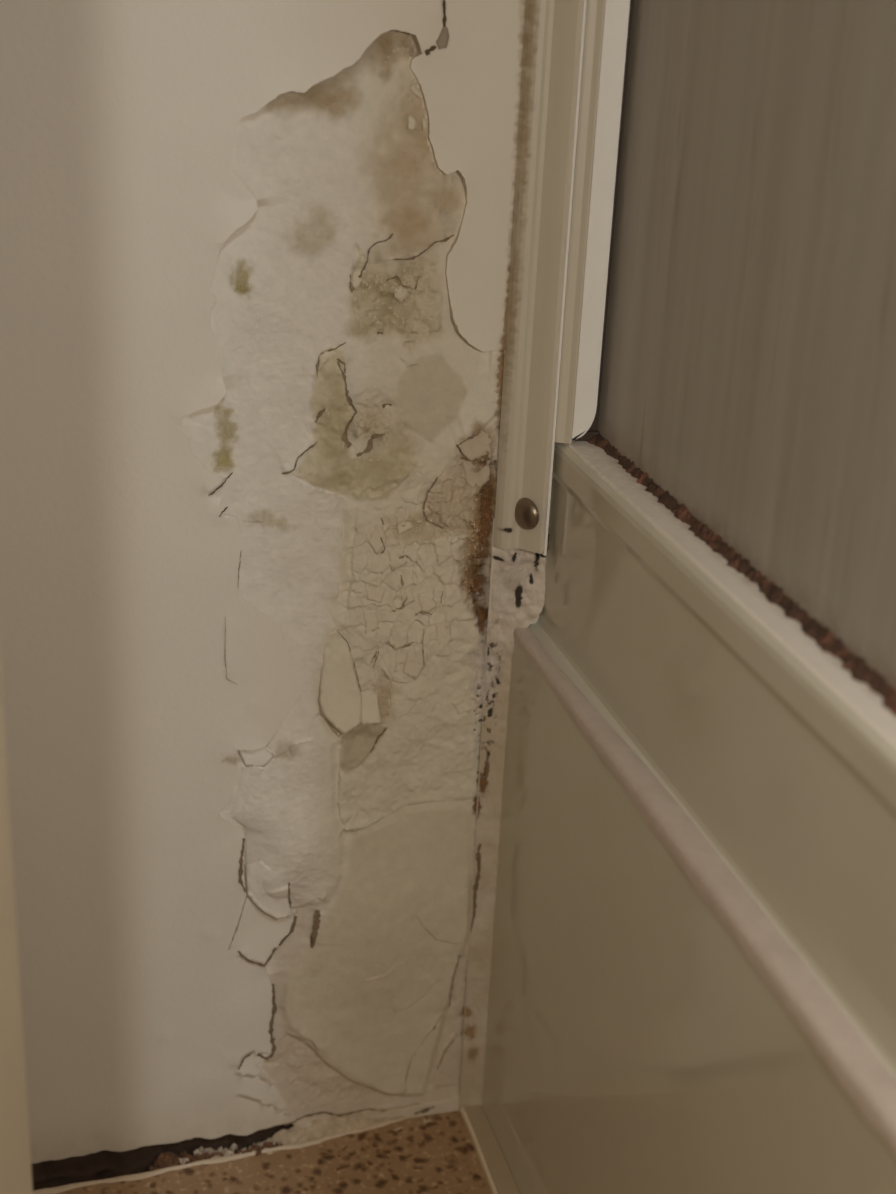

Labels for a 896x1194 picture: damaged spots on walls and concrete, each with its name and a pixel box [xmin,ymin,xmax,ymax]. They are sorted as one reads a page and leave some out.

peeling [180,30,504,788]
peeling [257,829,470,1127]